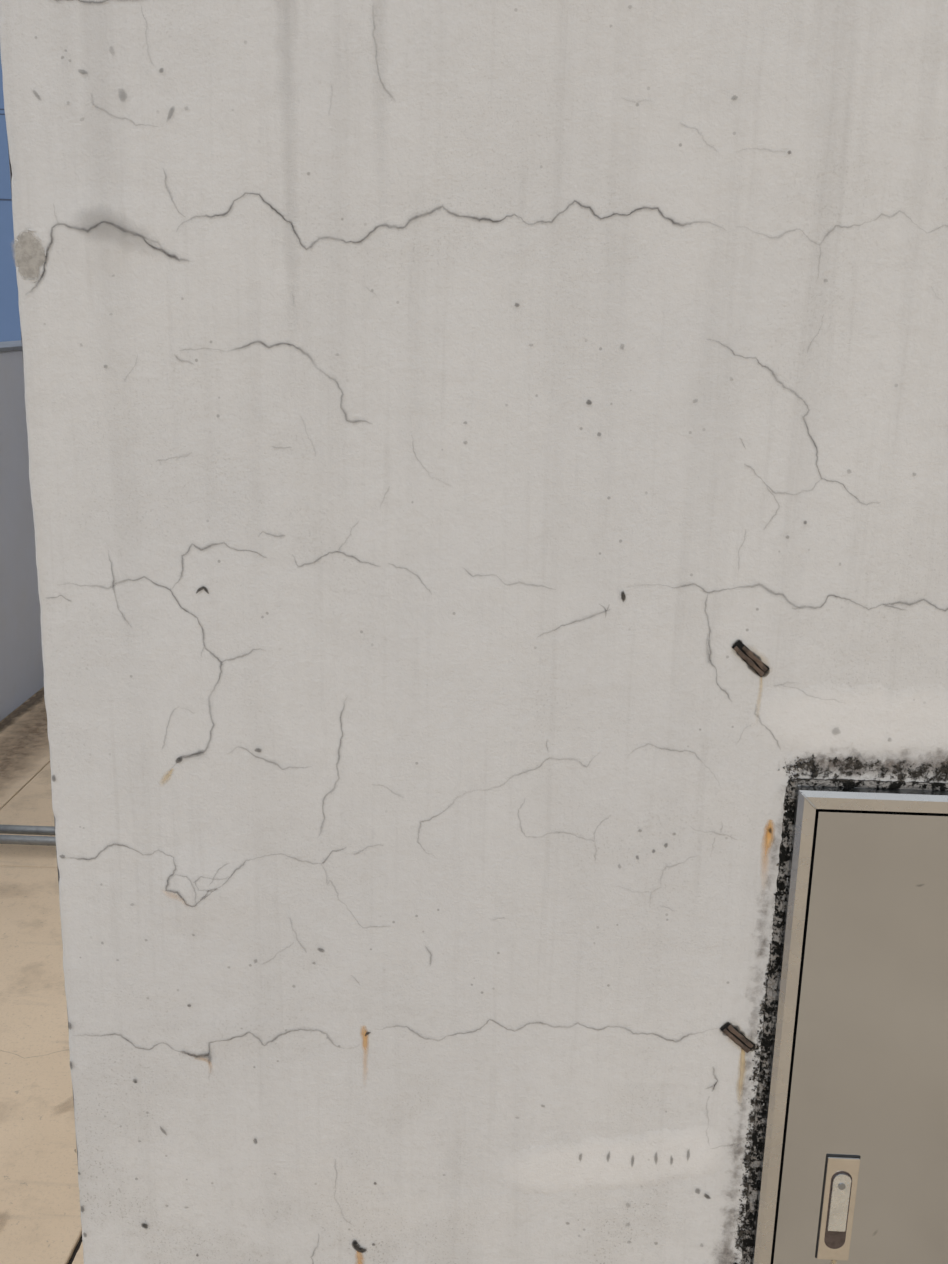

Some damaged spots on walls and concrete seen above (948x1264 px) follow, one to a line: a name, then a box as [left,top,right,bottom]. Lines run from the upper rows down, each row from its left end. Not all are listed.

crack [208,193,305,248]
crack [344,201,680,243]
mould [783,754,948,840]
mould [724,912,778,1264]